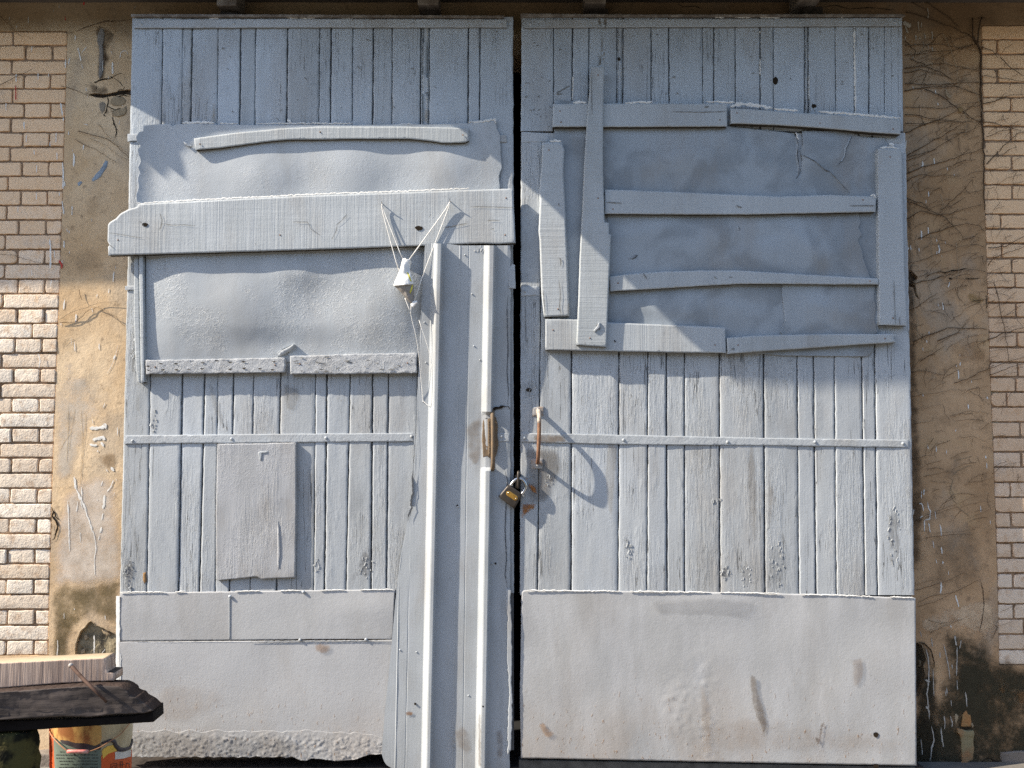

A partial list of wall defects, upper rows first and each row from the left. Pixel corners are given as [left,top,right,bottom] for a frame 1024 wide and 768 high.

crack [90,73,131,137]
spalling [75,621,116,659]
water stain [916,638,1024,762]